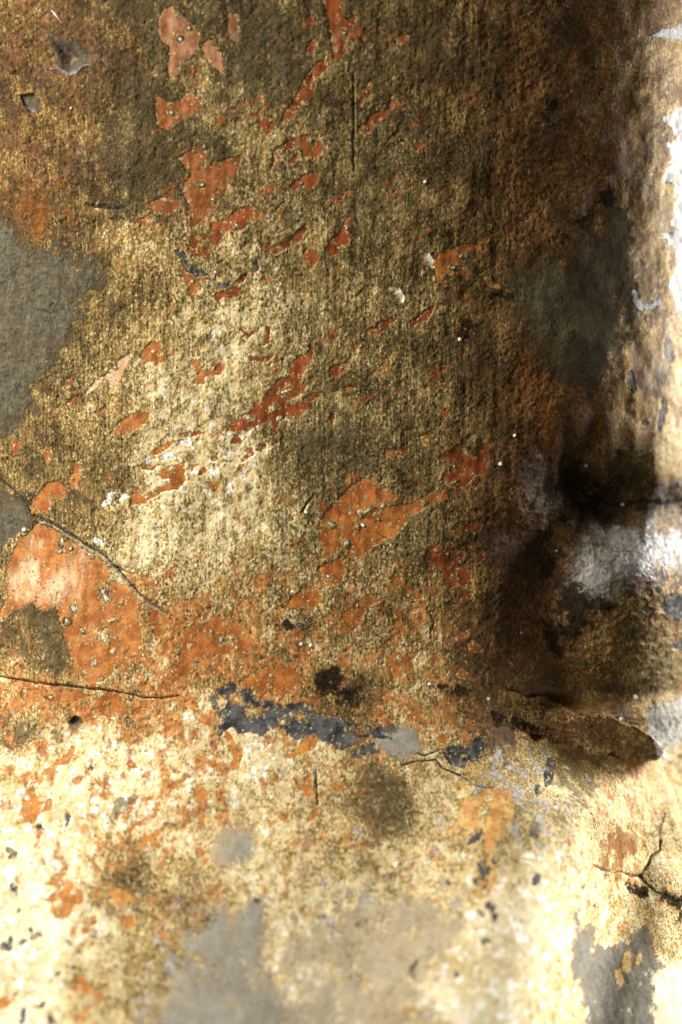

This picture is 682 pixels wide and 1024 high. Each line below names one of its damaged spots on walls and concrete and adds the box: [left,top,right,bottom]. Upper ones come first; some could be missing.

peeling [155,92,204,129]
peeling [157,6,224,81]
peeling [257,0,409,137]
peeling [137,146,260,260]
peeling [178,215,352,305]
water stain [460,317,473,339]
crack [0,477,172,618]
water stain [529,454,682,658]
crack [0,676,180,701]
water stain [436,683,473,696]
water stain [491,710,540,734]
crack [593,812,682,905]